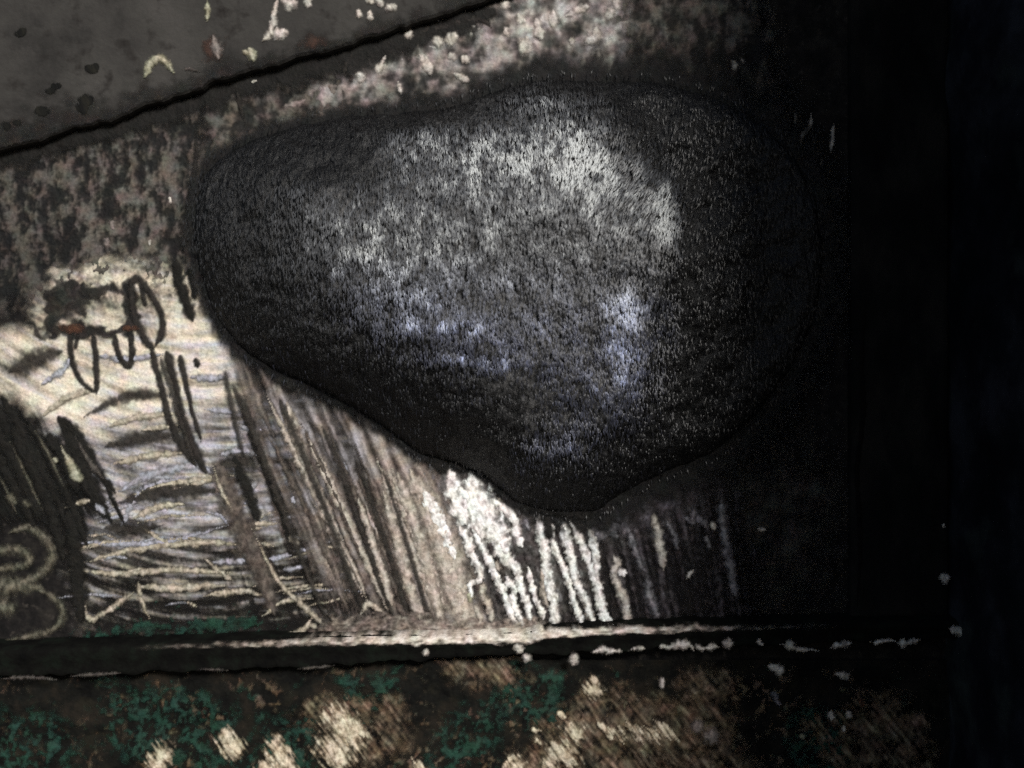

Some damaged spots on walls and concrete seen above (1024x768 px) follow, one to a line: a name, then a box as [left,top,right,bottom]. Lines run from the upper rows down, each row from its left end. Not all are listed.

crack [0,8,496,203]